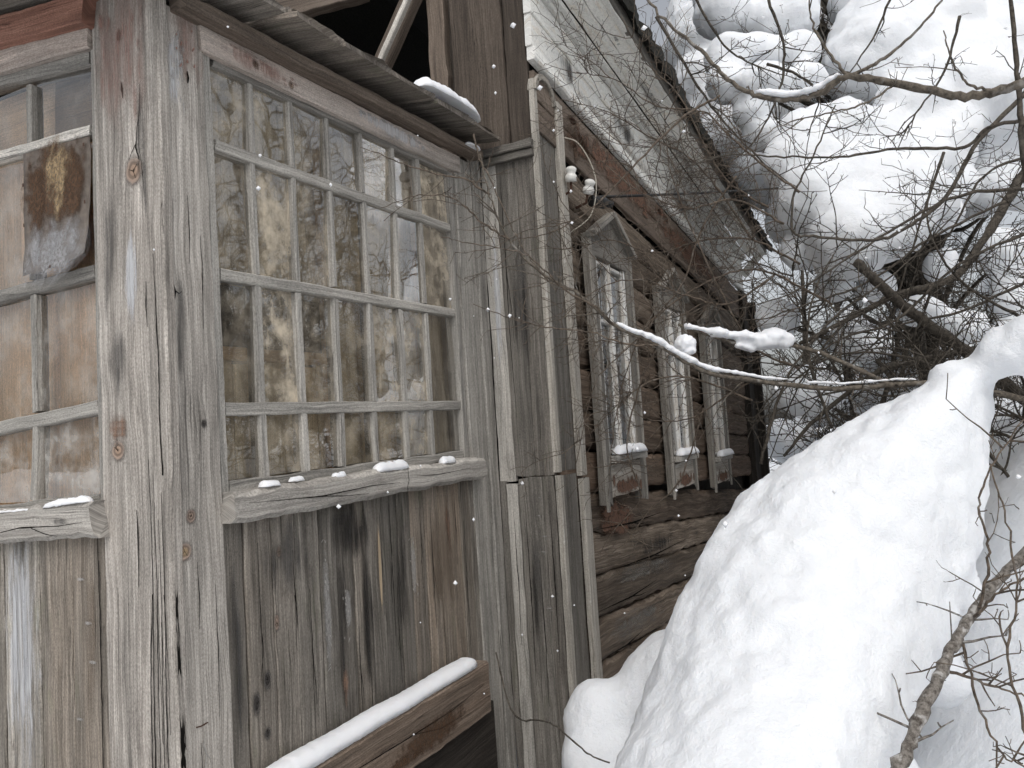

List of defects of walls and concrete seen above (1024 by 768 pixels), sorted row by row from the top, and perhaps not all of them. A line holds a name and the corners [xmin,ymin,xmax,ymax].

rust [21,140,85,238]
crack [121,82,145,197]
crack [136,195,219,768]